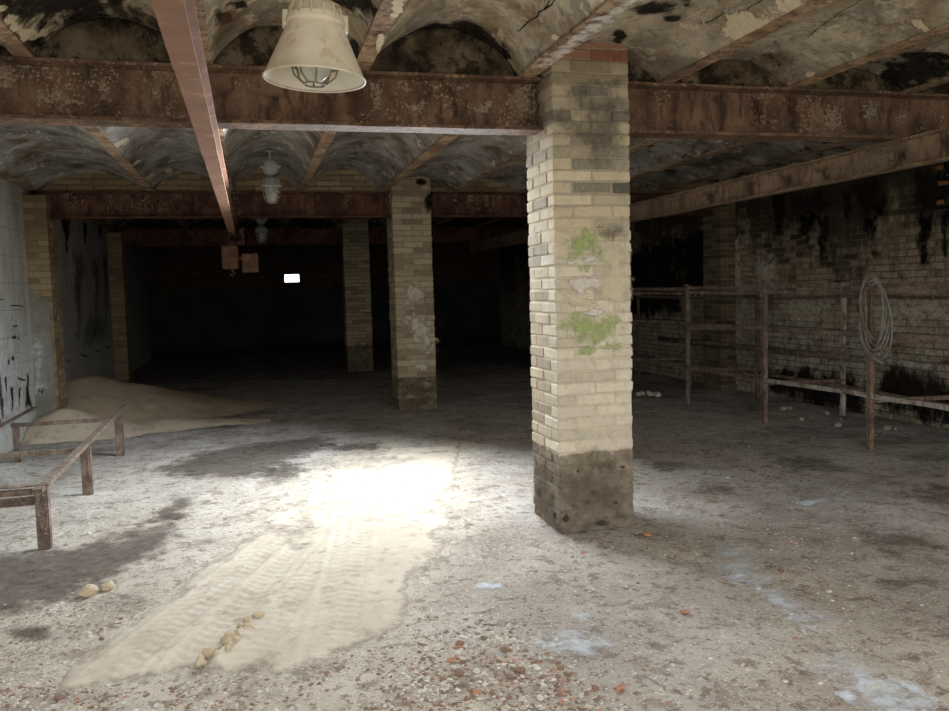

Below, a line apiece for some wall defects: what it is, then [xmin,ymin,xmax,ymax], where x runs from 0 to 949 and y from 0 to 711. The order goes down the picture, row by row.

peeling [389,0,406,20]
crack [517,0,555,32]
peeling [722,0,806,40]
peeling [911,19,929,32]
peeling [376,33,385,53]
leakage [915,213,949,264]
leakage [0,374,29,417]